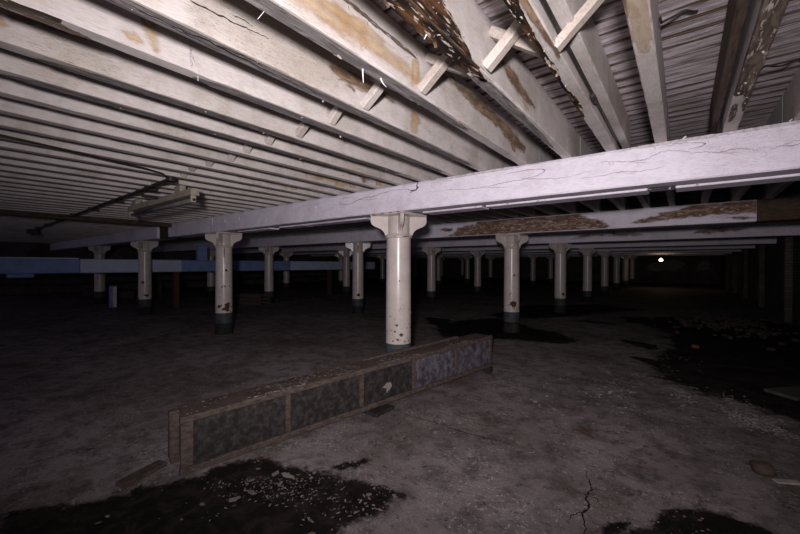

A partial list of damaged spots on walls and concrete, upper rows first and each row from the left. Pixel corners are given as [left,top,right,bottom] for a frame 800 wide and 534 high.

crack [120,0,320,95]
peeling [106,0,525,181]
damp [330,65,373,92]
damp [297,0,420,85]
peeling [382,0,553,148]
damp [442,73,526,152]
peeling [630,0,800,150]
crack [341,140,800,205]
damp [426,304,800,421]
damp [0,457,407,534]
crack [569,471,600,534]
damp [603,509,773,534]